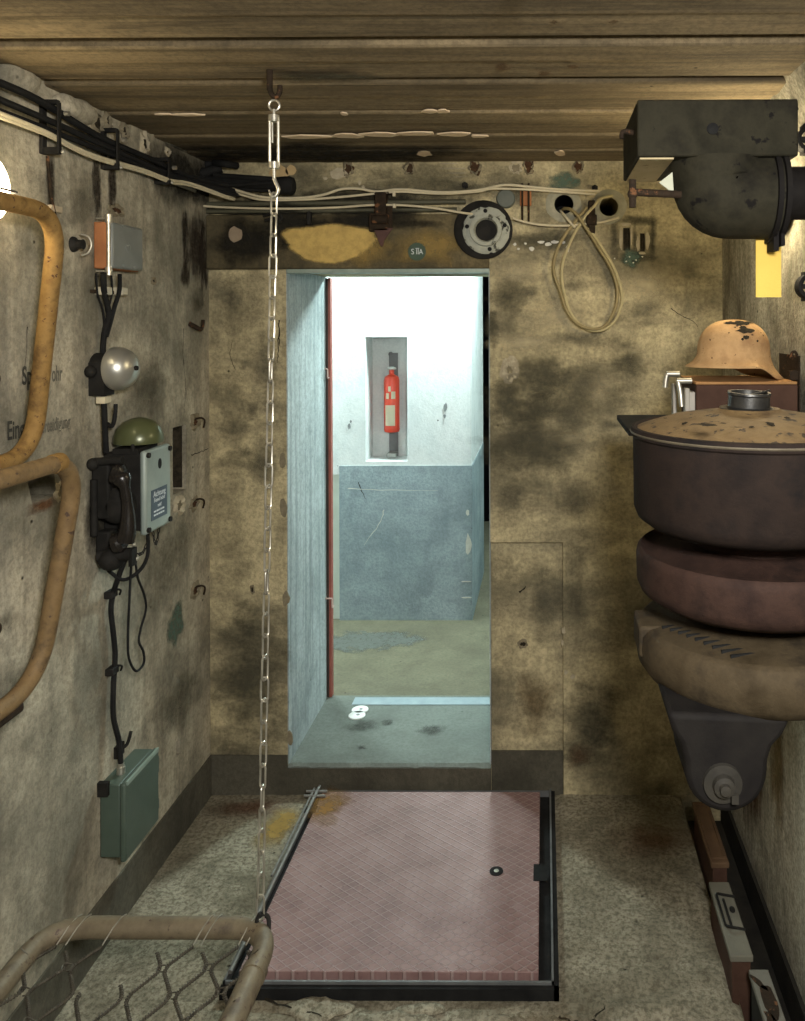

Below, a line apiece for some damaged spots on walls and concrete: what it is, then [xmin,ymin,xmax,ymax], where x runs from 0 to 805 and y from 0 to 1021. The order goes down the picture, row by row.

damp [495,363,570,458]
damp [227,620,270,719]
spalling [278,996,446,1021]